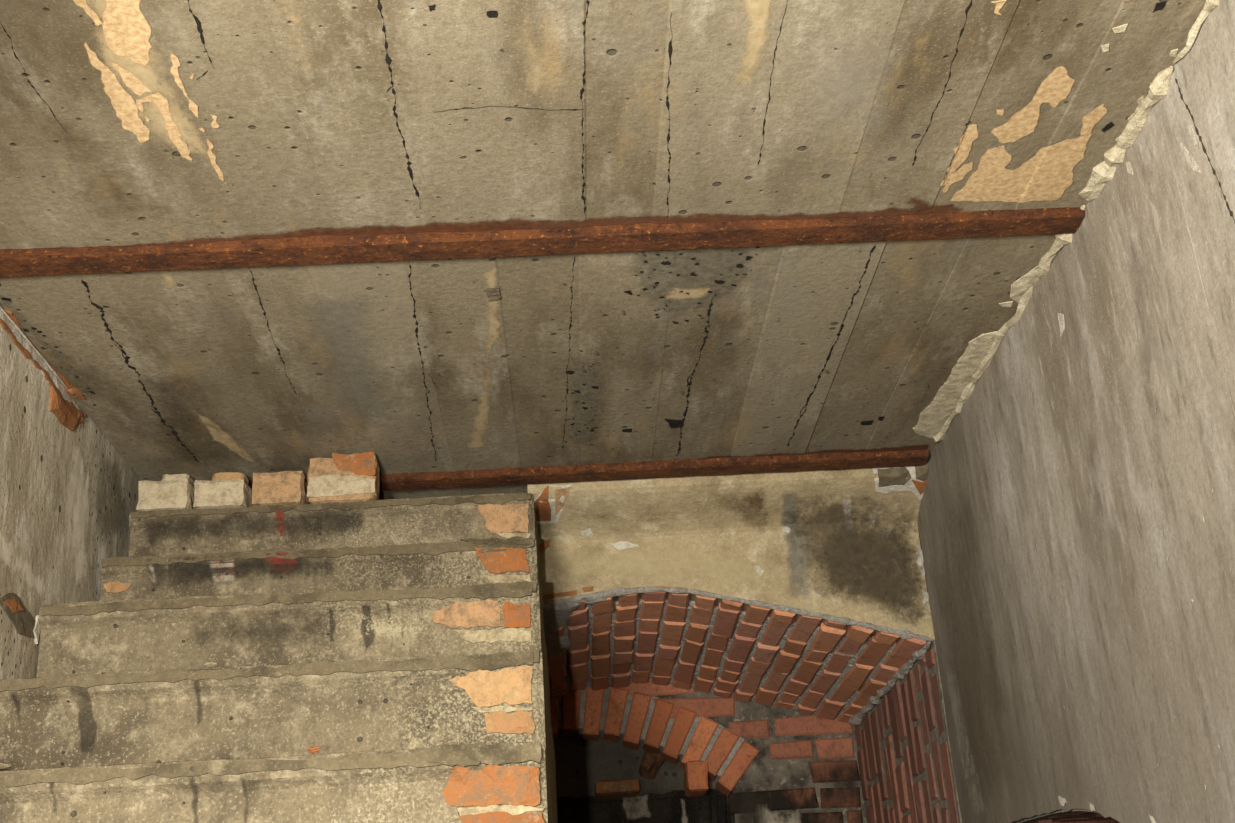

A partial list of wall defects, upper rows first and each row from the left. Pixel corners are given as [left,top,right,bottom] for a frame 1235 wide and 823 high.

spalling [73,0,192,161]
crack [377,0,421,209]
crack [665,12,673,217]
spalling [940,66,1107,203]
crack [1175,78,1235,223]
corrosion [118,199,961,247]
crack [81,280,199,463]
corrosion [685,445,928,460]
flaking render [471,485,572,575]
leakage [797,508,921,616]
flaking render [449,665,535,735]
flaking render [442,765,545,823]